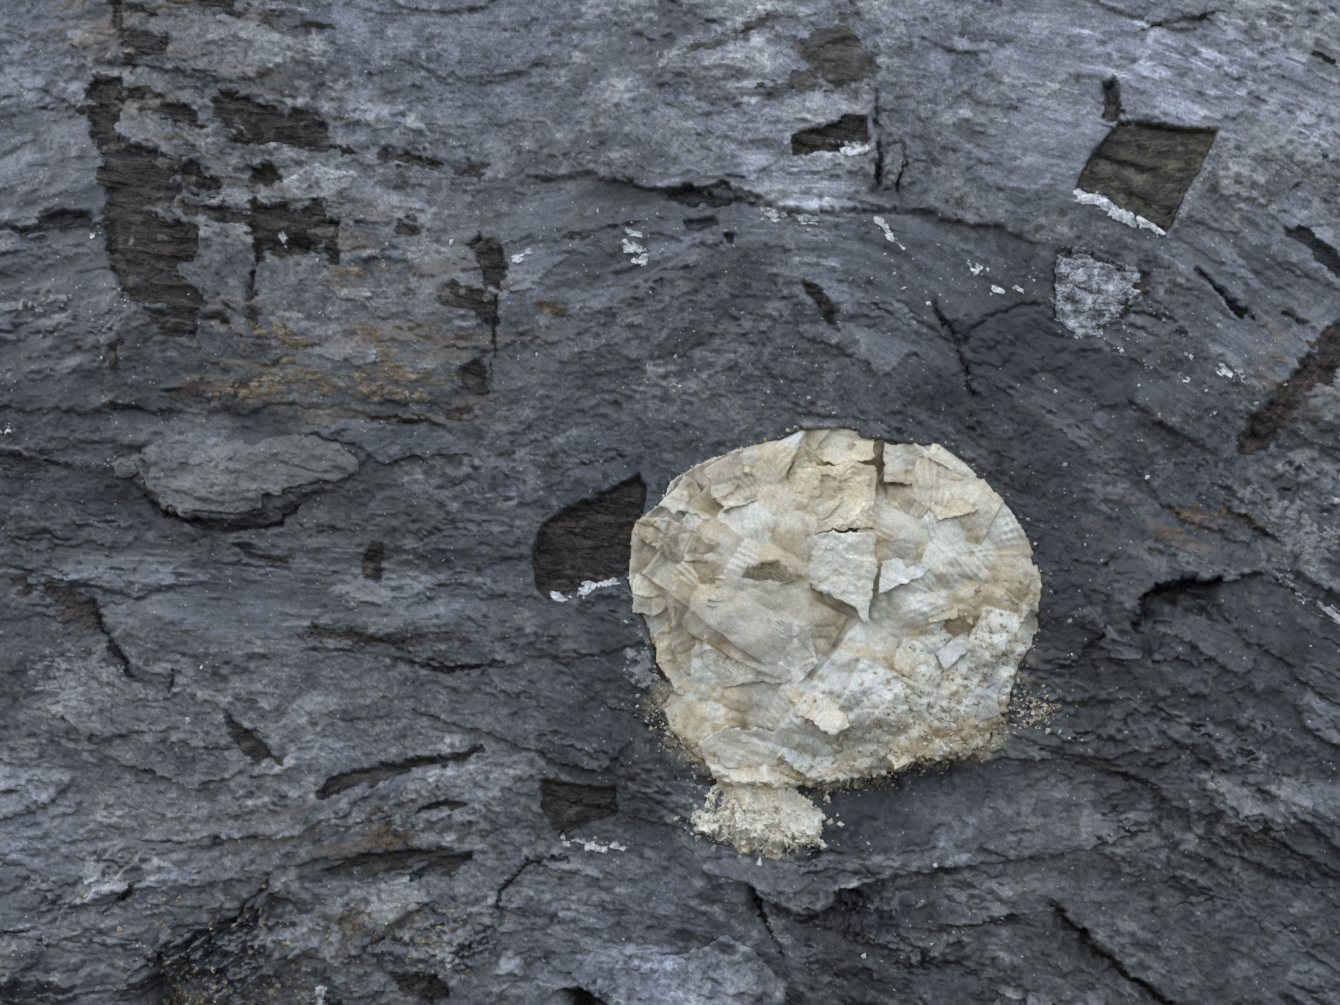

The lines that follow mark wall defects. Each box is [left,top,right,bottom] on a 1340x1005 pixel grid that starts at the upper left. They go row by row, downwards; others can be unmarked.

spalling [5,0,356,342]
spalling [371,143,491,179]
spalling [791,113,870,156]
spalling [1077,74,1218,230]
corrosion [1230,323,1340,460]
spalling [532,474,646,598]
crack [1133,577,1223,634]
spalling [541,781,617,836]